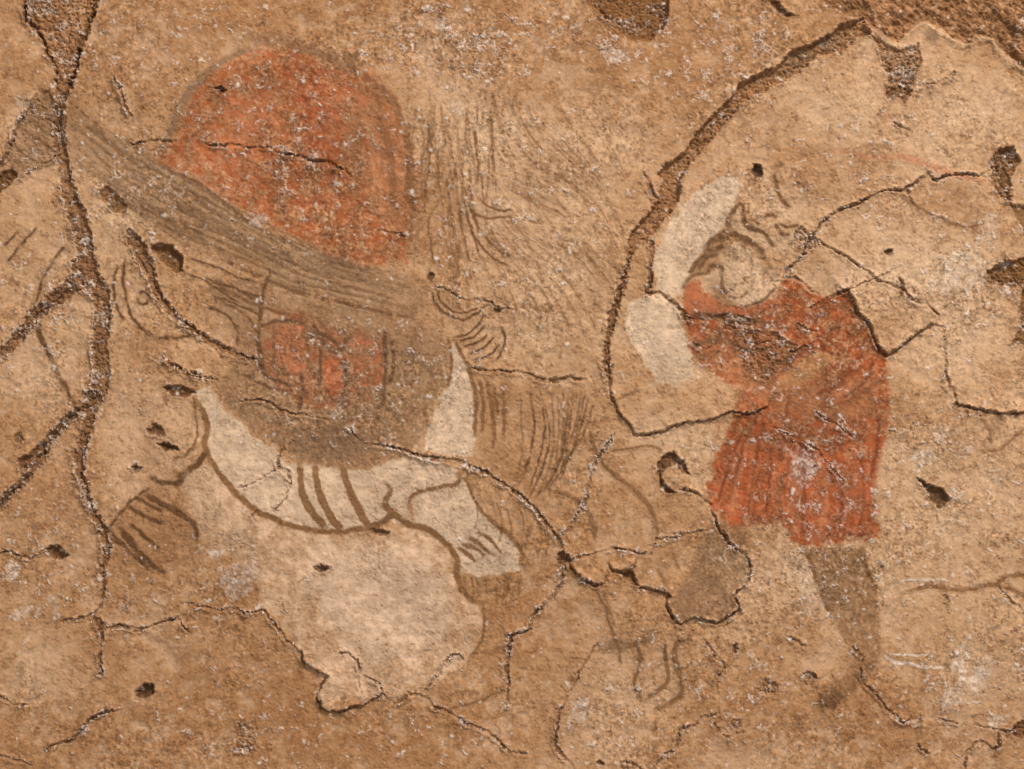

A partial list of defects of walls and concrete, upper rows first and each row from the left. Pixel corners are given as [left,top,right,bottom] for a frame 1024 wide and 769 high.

spalling [584,0,671,44]
spalling [818,0,1024,106]
crack [203,141,352,176]
crack [470,16,872,387]
spalling [987,145,1024,232]
crack [0,0,295,678]
spalling [149,241,184,275]
crack [752,169,992,409]
spalling [986,255,1024,348]
spalling [913,474,952,510]
crack [238,398,753,769]
crack [842,641,1024,769]